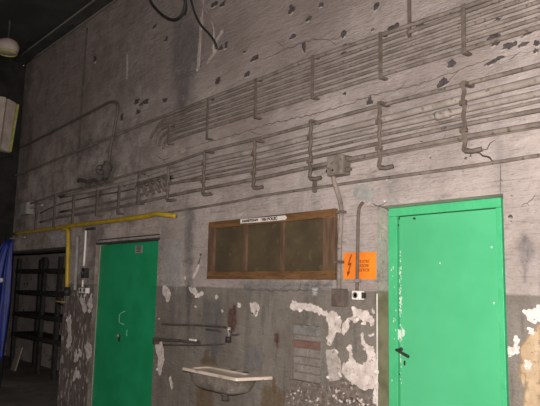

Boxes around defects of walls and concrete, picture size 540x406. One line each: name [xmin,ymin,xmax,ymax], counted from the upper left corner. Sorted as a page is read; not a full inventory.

crack [260,25,355,60]
spalling [484,32,540,67]
crack [157,48,540,162]
crack [477,140,503,192]
peeling [79,293,93,313]
peeling [250,302,260,317]
peeling [522,305,540,336]
peeling [66,314,92,382]
peeling [284,300,379,406]
peeling [508,335,520,357]